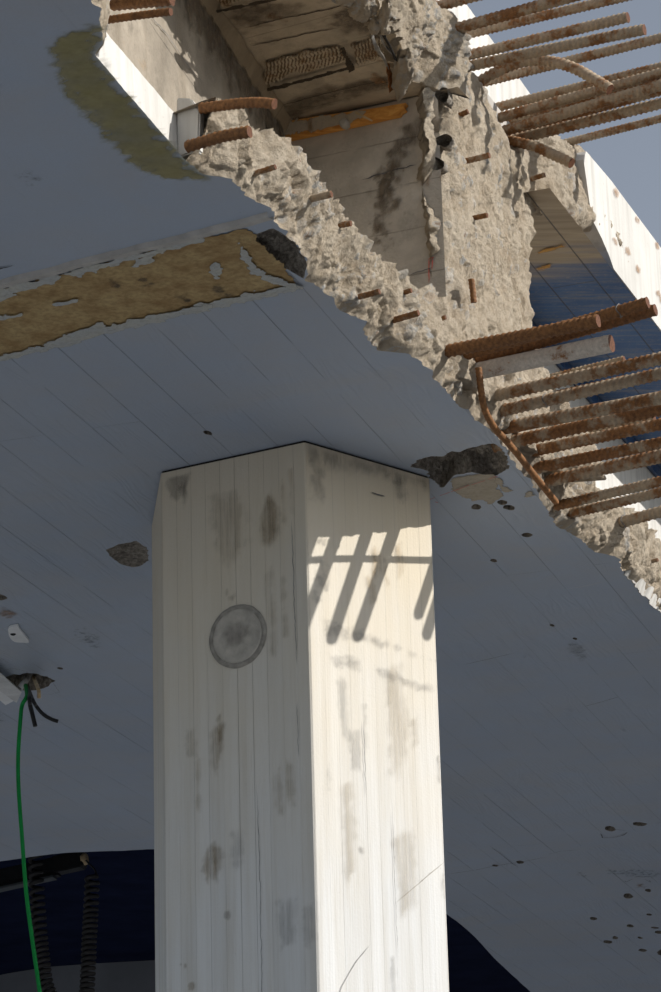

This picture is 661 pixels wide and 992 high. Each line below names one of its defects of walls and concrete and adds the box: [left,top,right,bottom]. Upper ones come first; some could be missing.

damp [51,28,205,179]
spalling [378,0,661,168]
spalling [0,97,661,617]